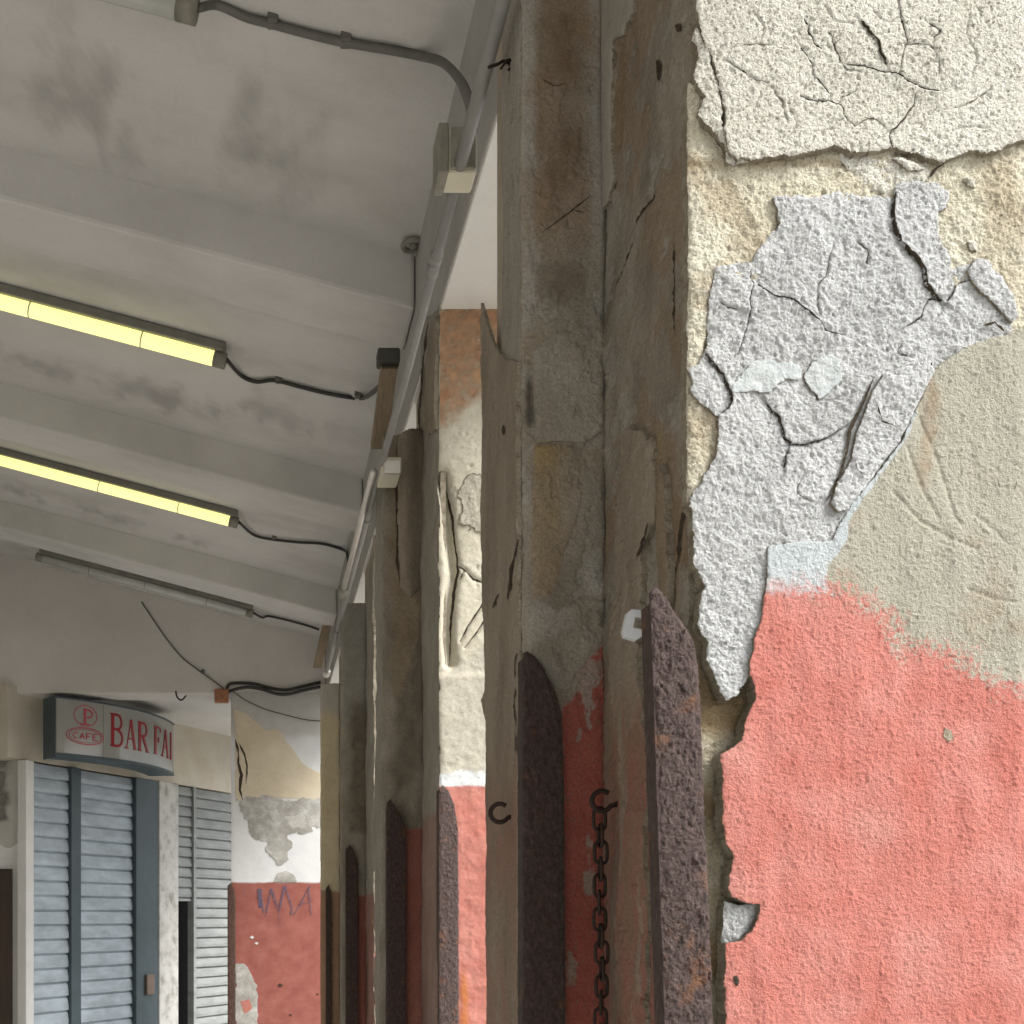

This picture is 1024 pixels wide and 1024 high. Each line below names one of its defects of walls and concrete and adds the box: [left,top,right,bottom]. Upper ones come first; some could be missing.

crack [725,4,992,148]
crack [540,196,591,234]
crack [706,241,869,412]
crack [891,192,969,366]
crack [983,321,1005,332]
crack [767,378,901,504]
flaking render [675,24,1024,1024]
flaking render [458,303,604,1024]
crack [235,739,248,799]
peeling [233,710,321,882]